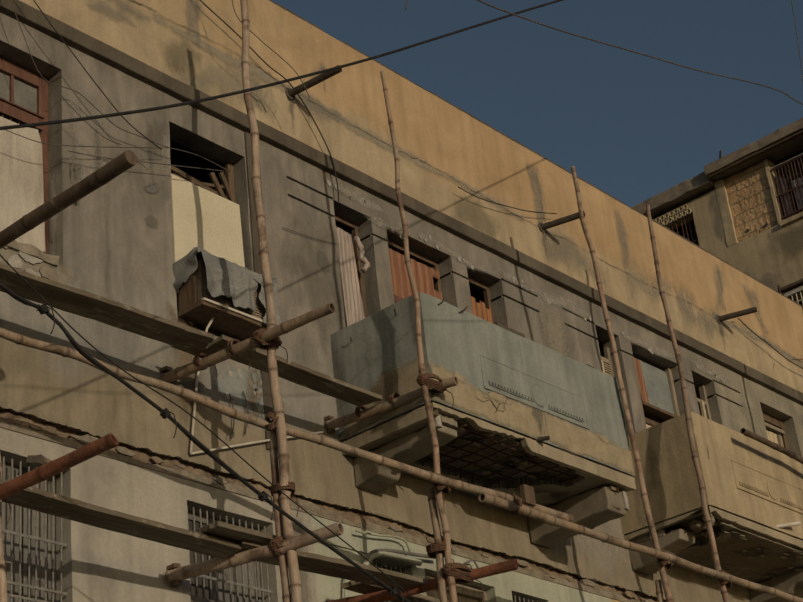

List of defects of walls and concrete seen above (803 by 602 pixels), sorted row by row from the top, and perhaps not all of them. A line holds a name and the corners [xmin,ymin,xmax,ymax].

spalling [0,398,273,502]
peeling [214,369,265,419]
peeling [341,358,635,499]
spalling [290,484,689,602]
spalling [636,511,747,541]